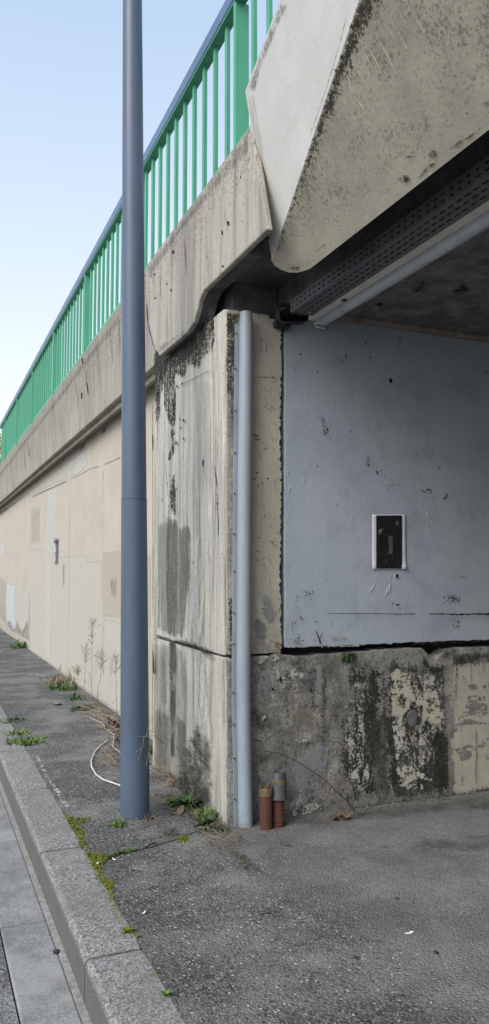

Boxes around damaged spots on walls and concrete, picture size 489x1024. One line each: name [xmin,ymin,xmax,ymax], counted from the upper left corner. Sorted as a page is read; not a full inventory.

damp [154,307,239,467]
damp [166,473,177,517]
damp [339,652,489,810]
peeling [390,640,489,795]